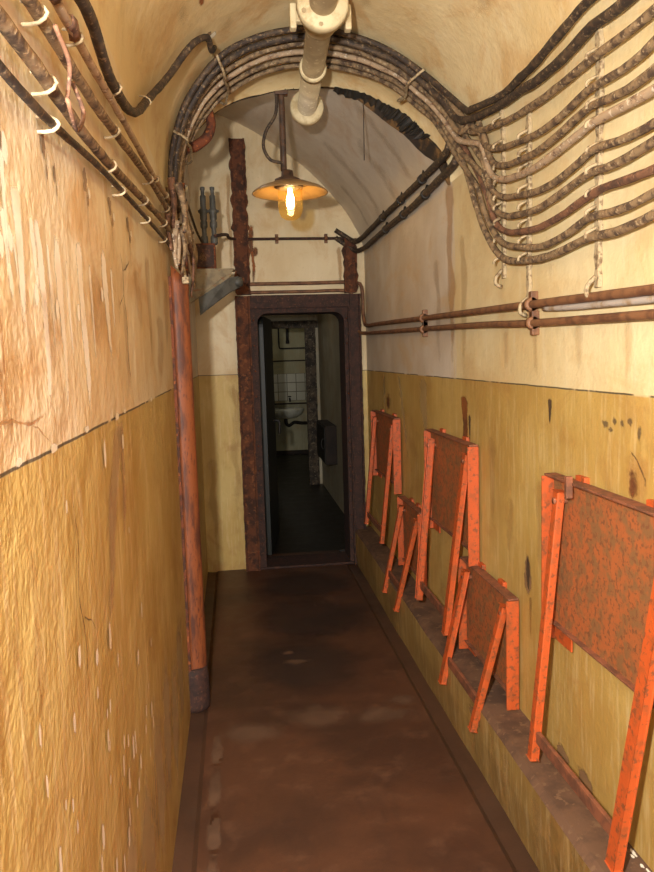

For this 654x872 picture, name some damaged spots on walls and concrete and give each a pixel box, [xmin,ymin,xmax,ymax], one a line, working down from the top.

damp [0,186,115,401]
crack [0,320,48,449]
peeling [116,701,154,872]